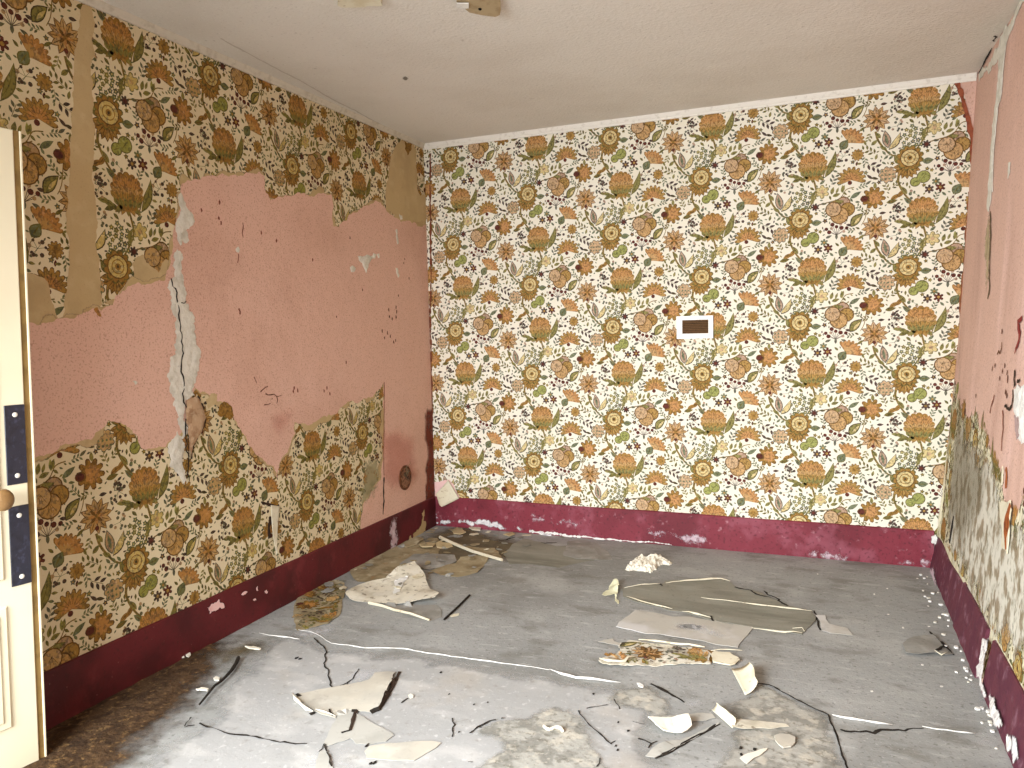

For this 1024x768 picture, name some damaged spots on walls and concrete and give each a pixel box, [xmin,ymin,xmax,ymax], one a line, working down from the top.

flaking render [979,0,1024,299]
flaking render [167,193,203,483]
crack [171,278,190,481]
flaking render [992,363,1024,444]
damp [948,425,1024,660]
crack [184,717,332,766]
crack [314,638,359,687]
crack [452,717,505,737]
crack [578,699,657,767]
crack [651,683,685,703]
crack [760,683,848,768]